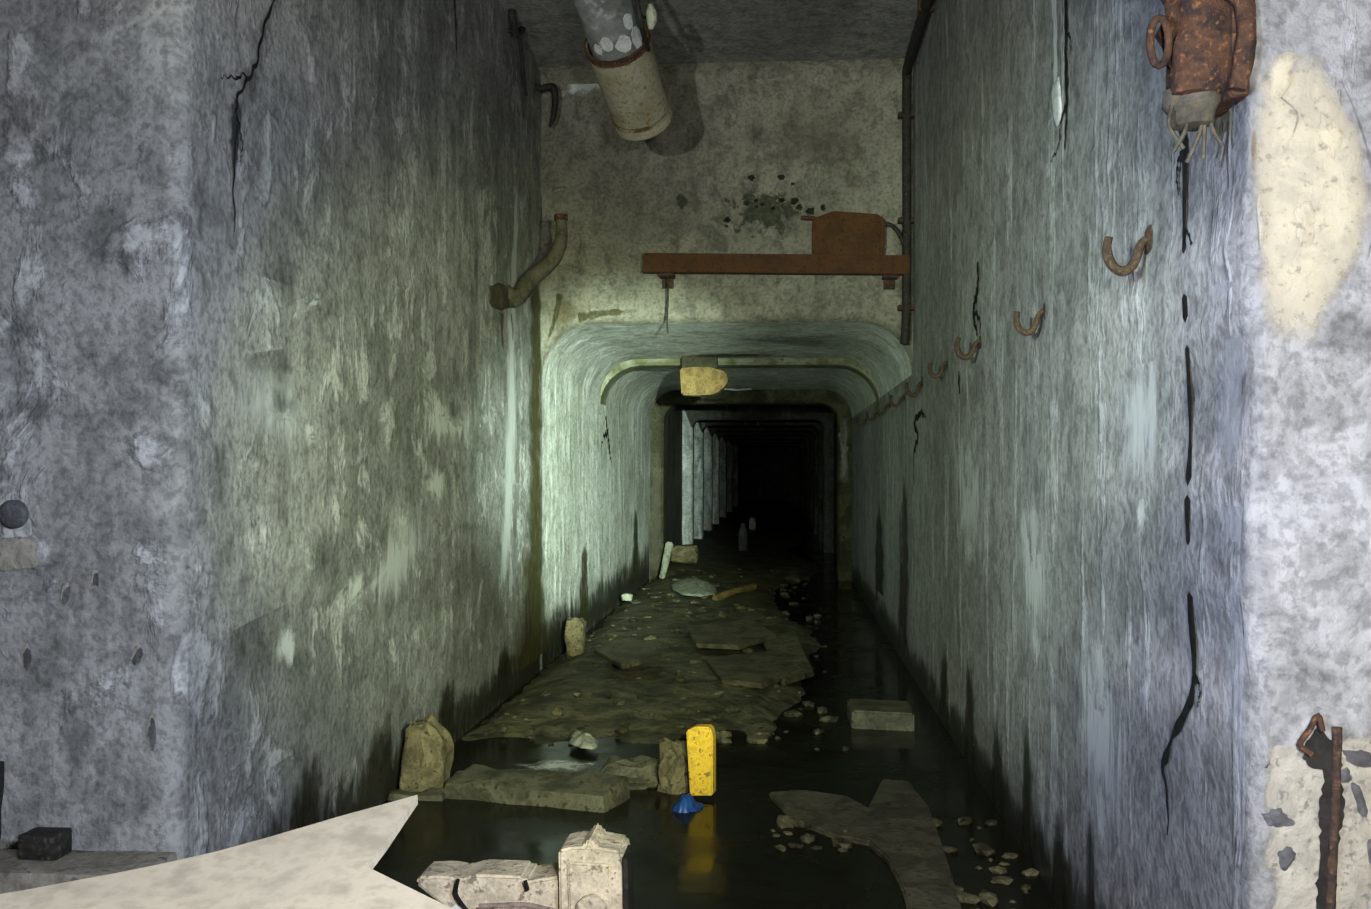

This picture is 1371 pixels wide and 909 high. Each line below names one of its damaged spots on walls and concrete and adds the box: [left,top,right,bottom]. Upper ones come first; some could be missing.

crack [221,0,275,232]
mould [722,174,826,238]
crack [1175,131,1193,254]
crack [1182,294,1192,545]
crack [1161,592,1201,835]
spalling [1262,713,1371,909]